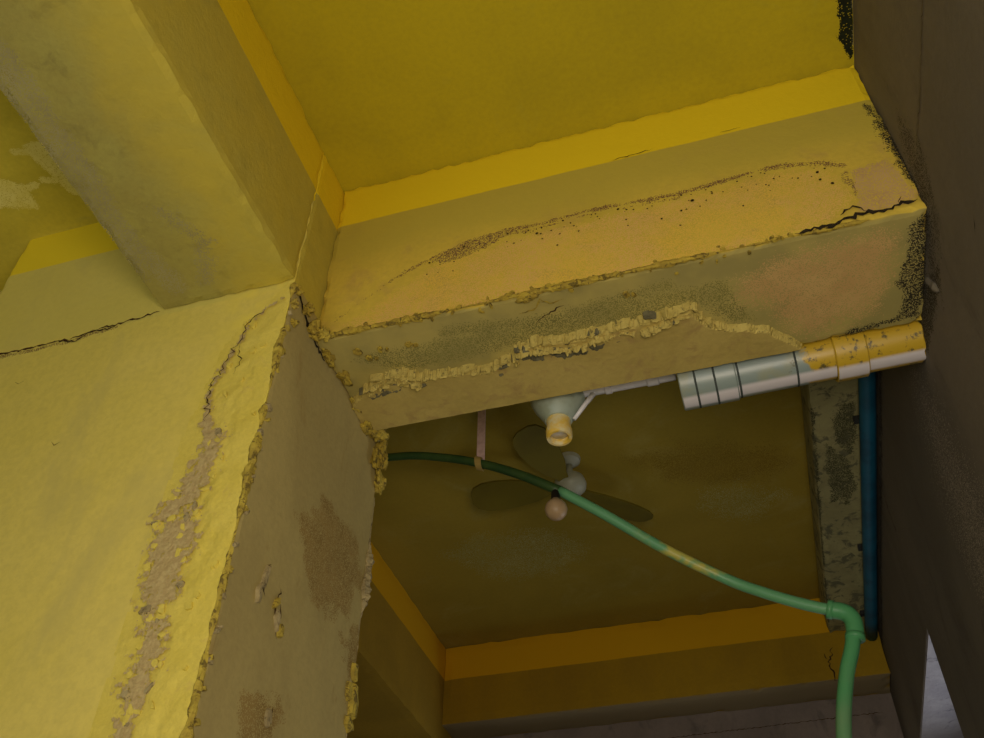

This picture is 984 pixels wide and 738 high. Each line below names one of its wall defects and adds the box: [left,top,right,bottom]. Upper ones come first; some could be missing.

leakage [835,0,853,59]
peeling [0,141,79,210]
crack [795,197,917,234]
crack [0,311,159,359]
spalling [108,220,868,738]
leakage [293,494,363,678]